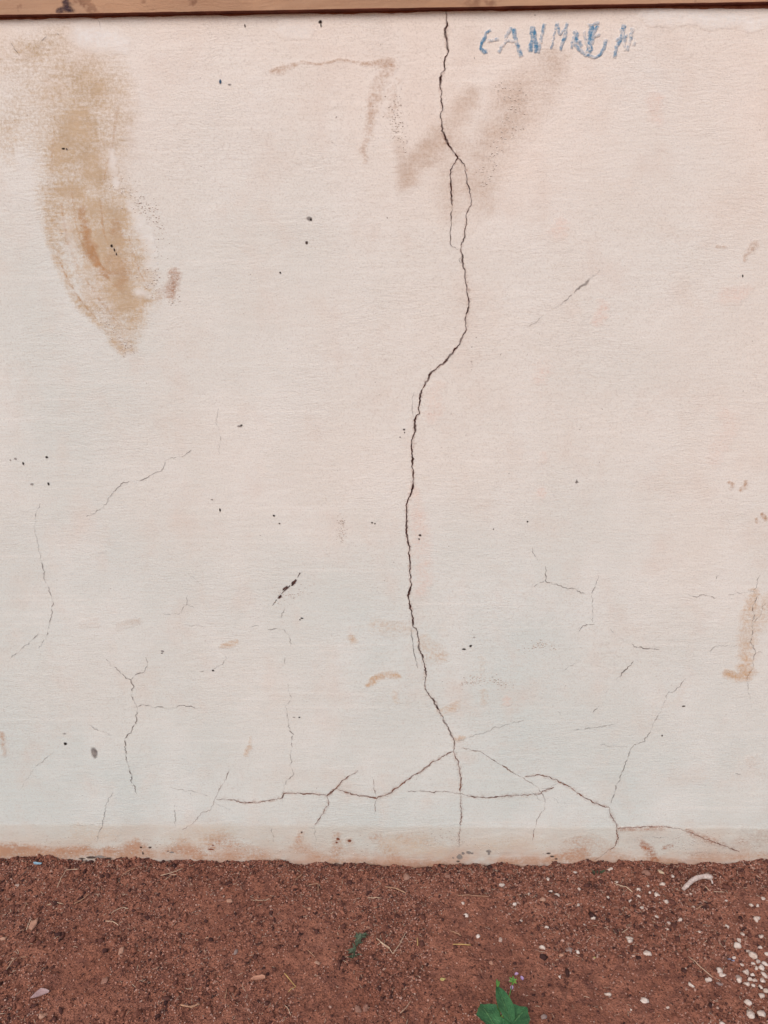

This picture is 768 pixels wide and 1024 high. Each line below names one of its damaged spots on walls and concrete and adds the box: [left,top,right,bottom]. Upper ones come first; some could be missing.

leakage [0,0,184,358]
leakage [272,18,317,41]
leakage [268,55,402,164]
leakage [390,42,575,227]
crack [184,14,671,860]